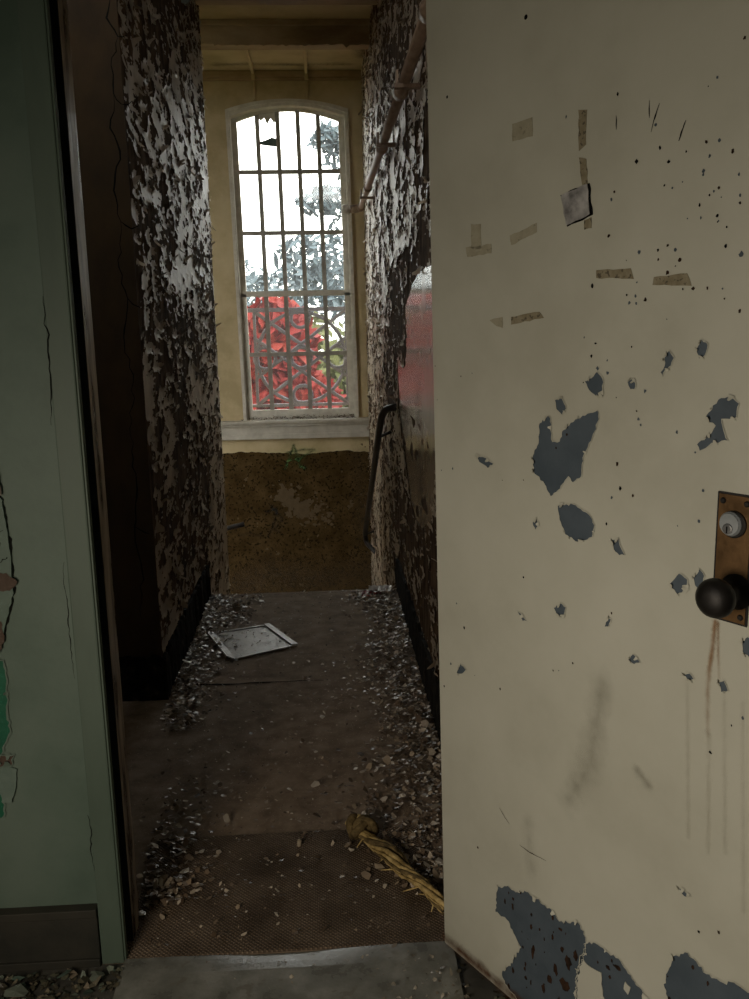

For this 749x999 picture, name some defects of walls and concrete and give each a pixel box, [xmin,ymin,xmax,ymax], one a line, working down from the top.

peeling [118,0,475,687]